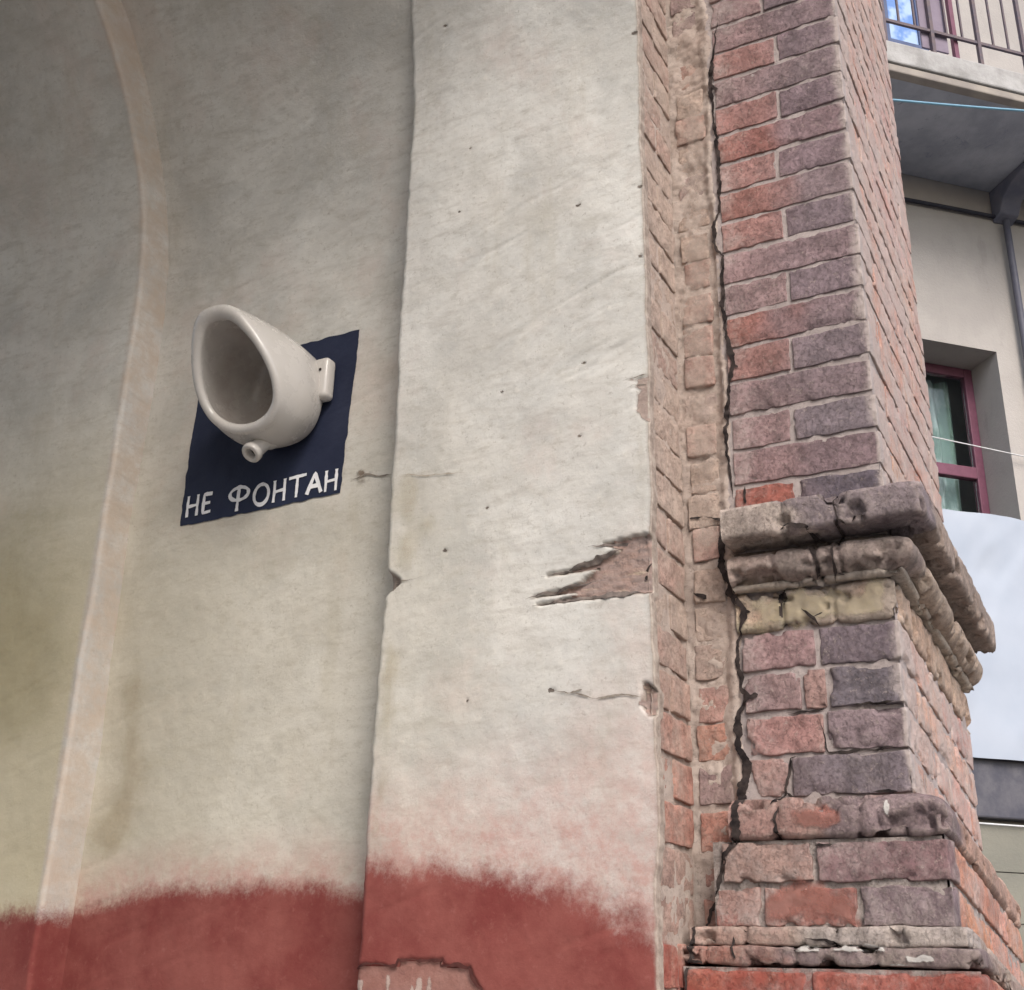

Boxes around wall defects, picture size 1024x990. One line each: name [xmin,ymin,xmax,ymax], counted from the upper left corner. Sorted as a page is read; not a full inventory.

crack [708,24,746,503]
flaking render [529,534,653,606]
crack [782,496,846,581]
crack [553,689,641,699]
peeling [357,958,483,990]